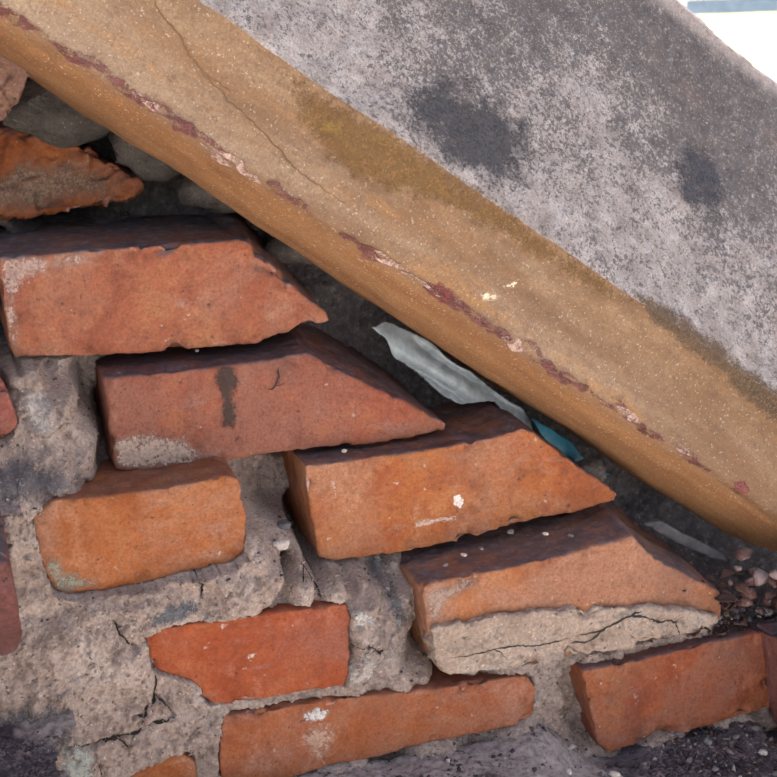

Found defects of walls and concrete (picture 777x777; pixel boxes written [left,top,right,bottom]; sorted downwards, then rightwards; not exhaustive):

peeling [0,3,307,210]
crack [154,0,346,203]
leakage [293,75,620,297]
leakage [675,139,731,223]
peeling [340,232,664,442]
peeling [676,445,712,472]
crack [455,612,684,658]